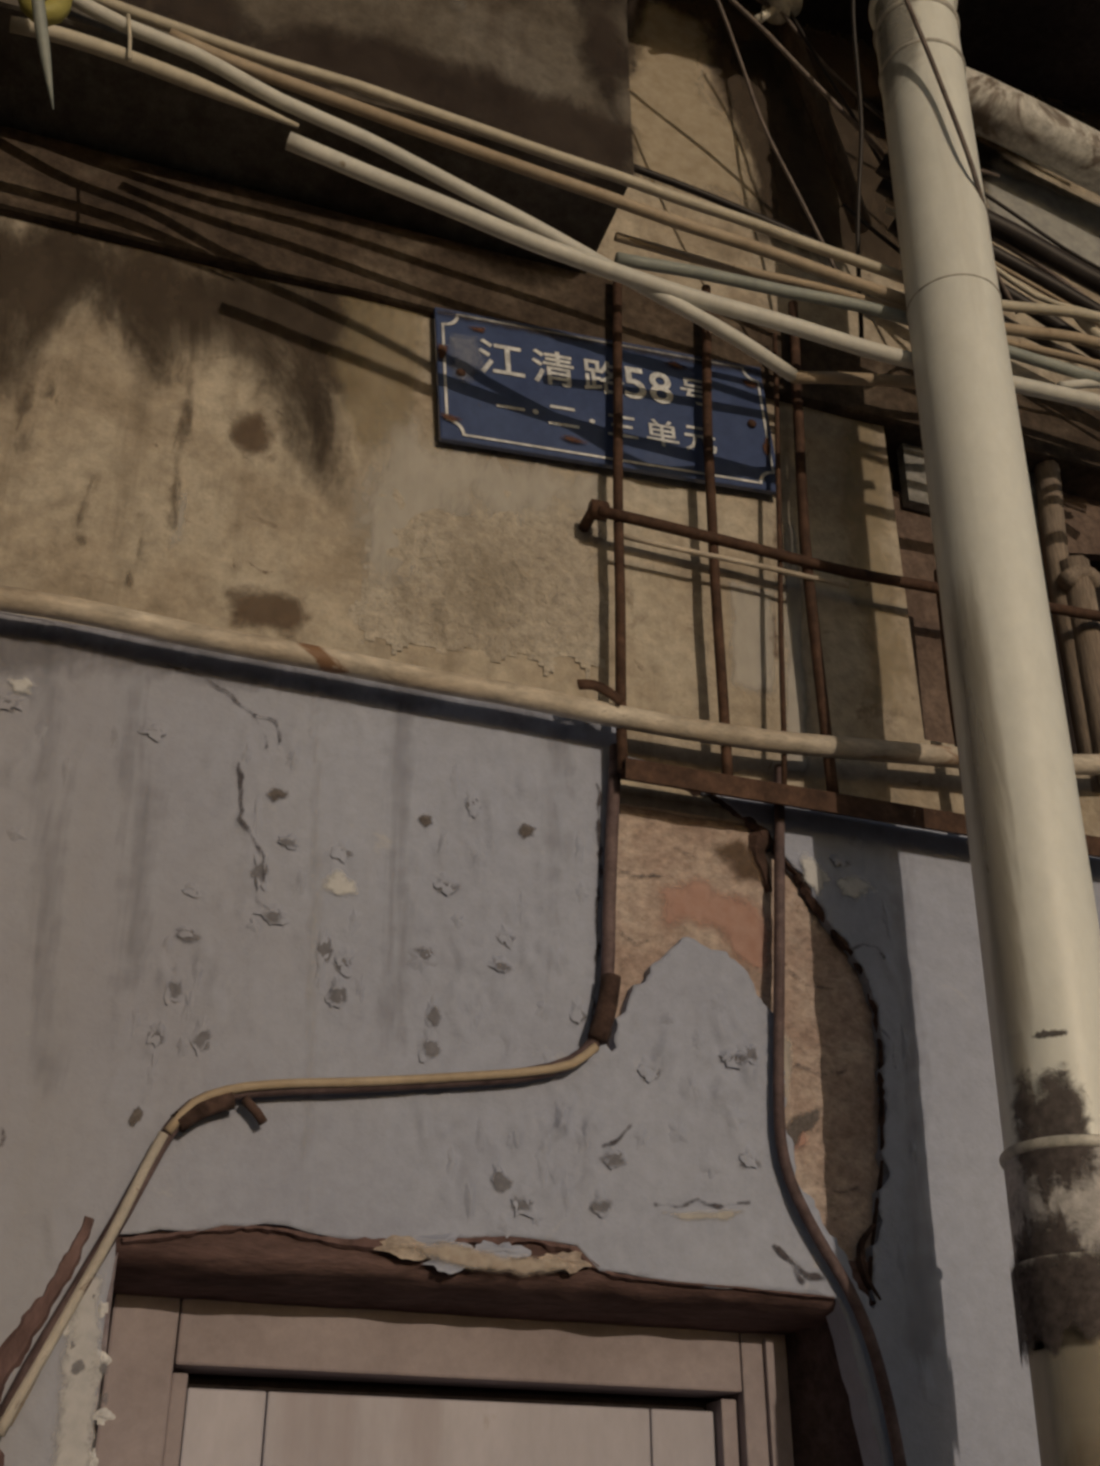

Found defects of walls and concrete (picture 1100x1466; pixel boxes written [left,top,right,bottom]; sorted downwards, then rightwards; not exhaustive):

leakage [119,0,759,201]
leakage [232,414,271,450]
leakage [230,592,308,628]
flaking render [607,805,880,1261]
spalling [122,1225,835,1301]
peeling [54,1277,116,1466]